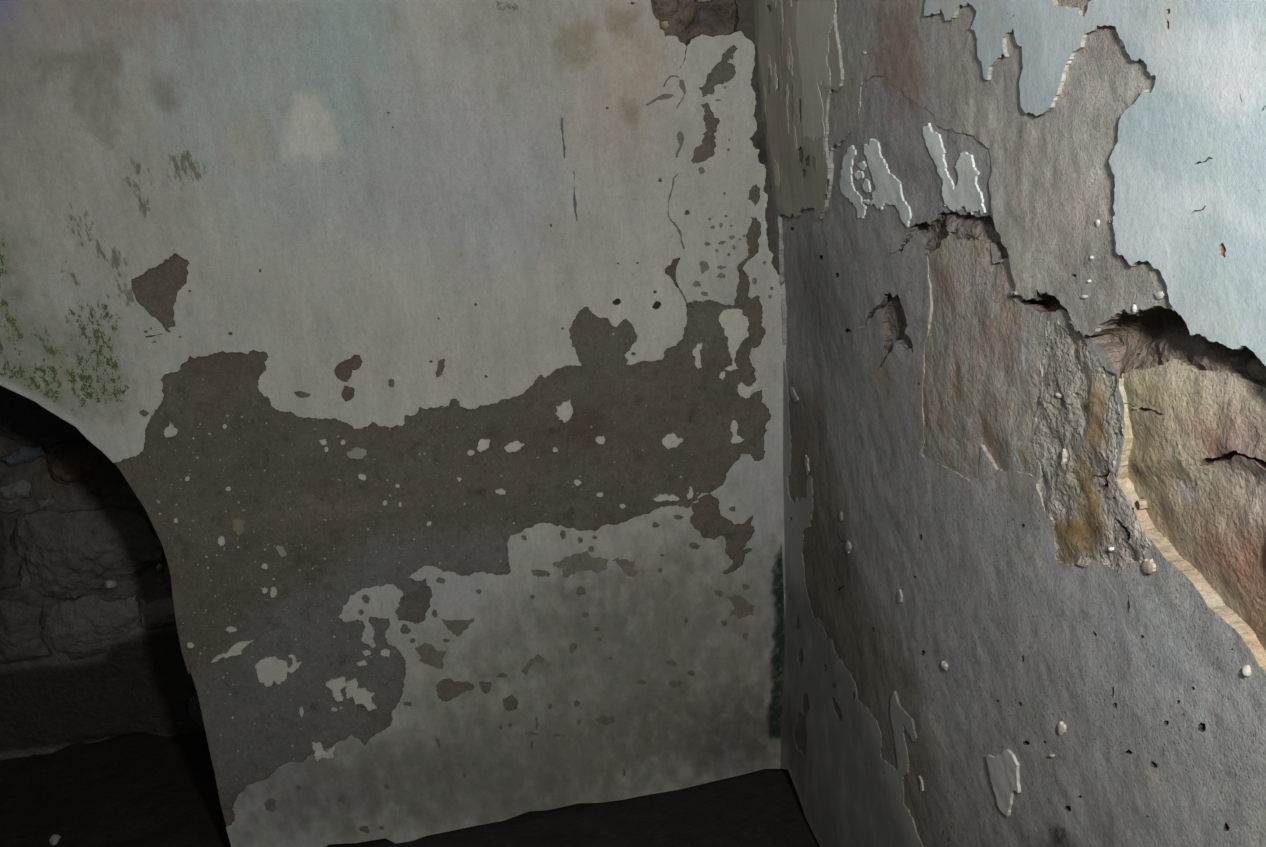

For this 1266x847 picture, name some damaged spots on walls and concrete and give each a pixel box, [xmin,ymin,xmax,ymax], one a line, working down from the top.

spalling [651,0,739,175]
flaking render [748,184,760,206]
water stain [0,299,68,359]
water stain [66,304,120,352]
spalling [761,0,1266,847]
spalling [115,215,771,827]